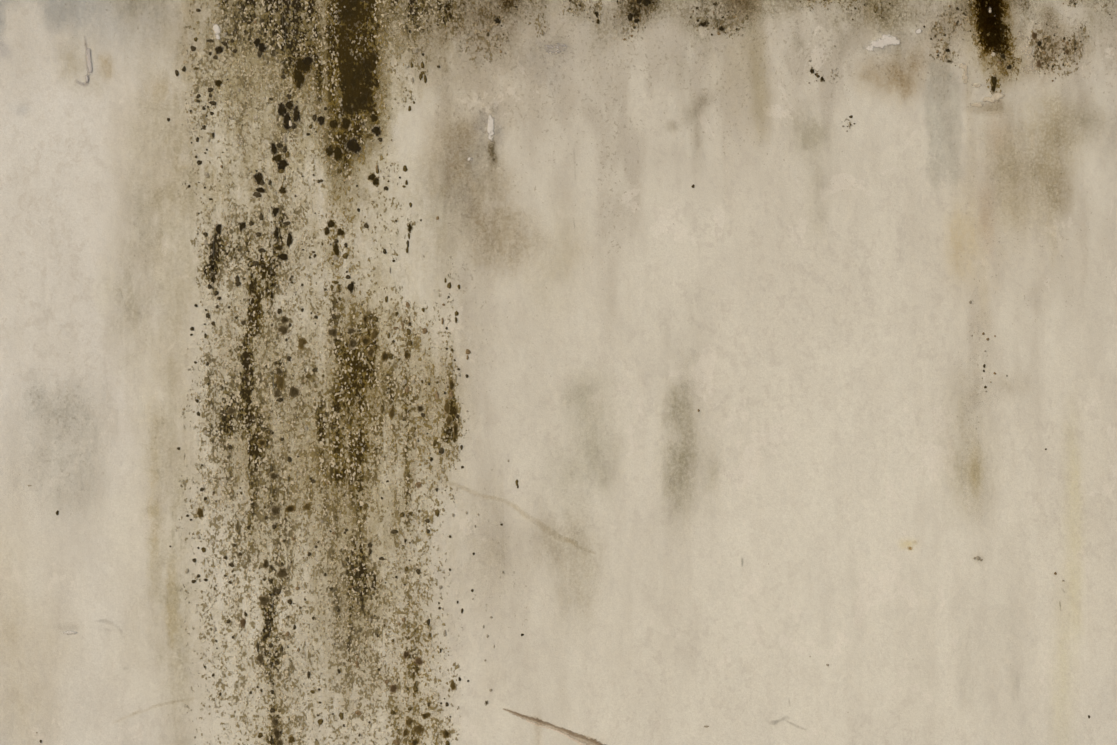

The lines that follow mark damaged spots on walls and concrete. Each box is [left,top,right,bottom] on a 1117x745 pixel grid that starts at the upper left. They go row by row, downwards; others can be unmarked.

water stain [562,0,659,42]
water stain [689,0,748,39]
water stain [800,0,891,20]
water stain [923,0,1017,94]
water stain [1025,23,1089,82]
water stain [175,0,550,745]
crack [503,709,606,745]